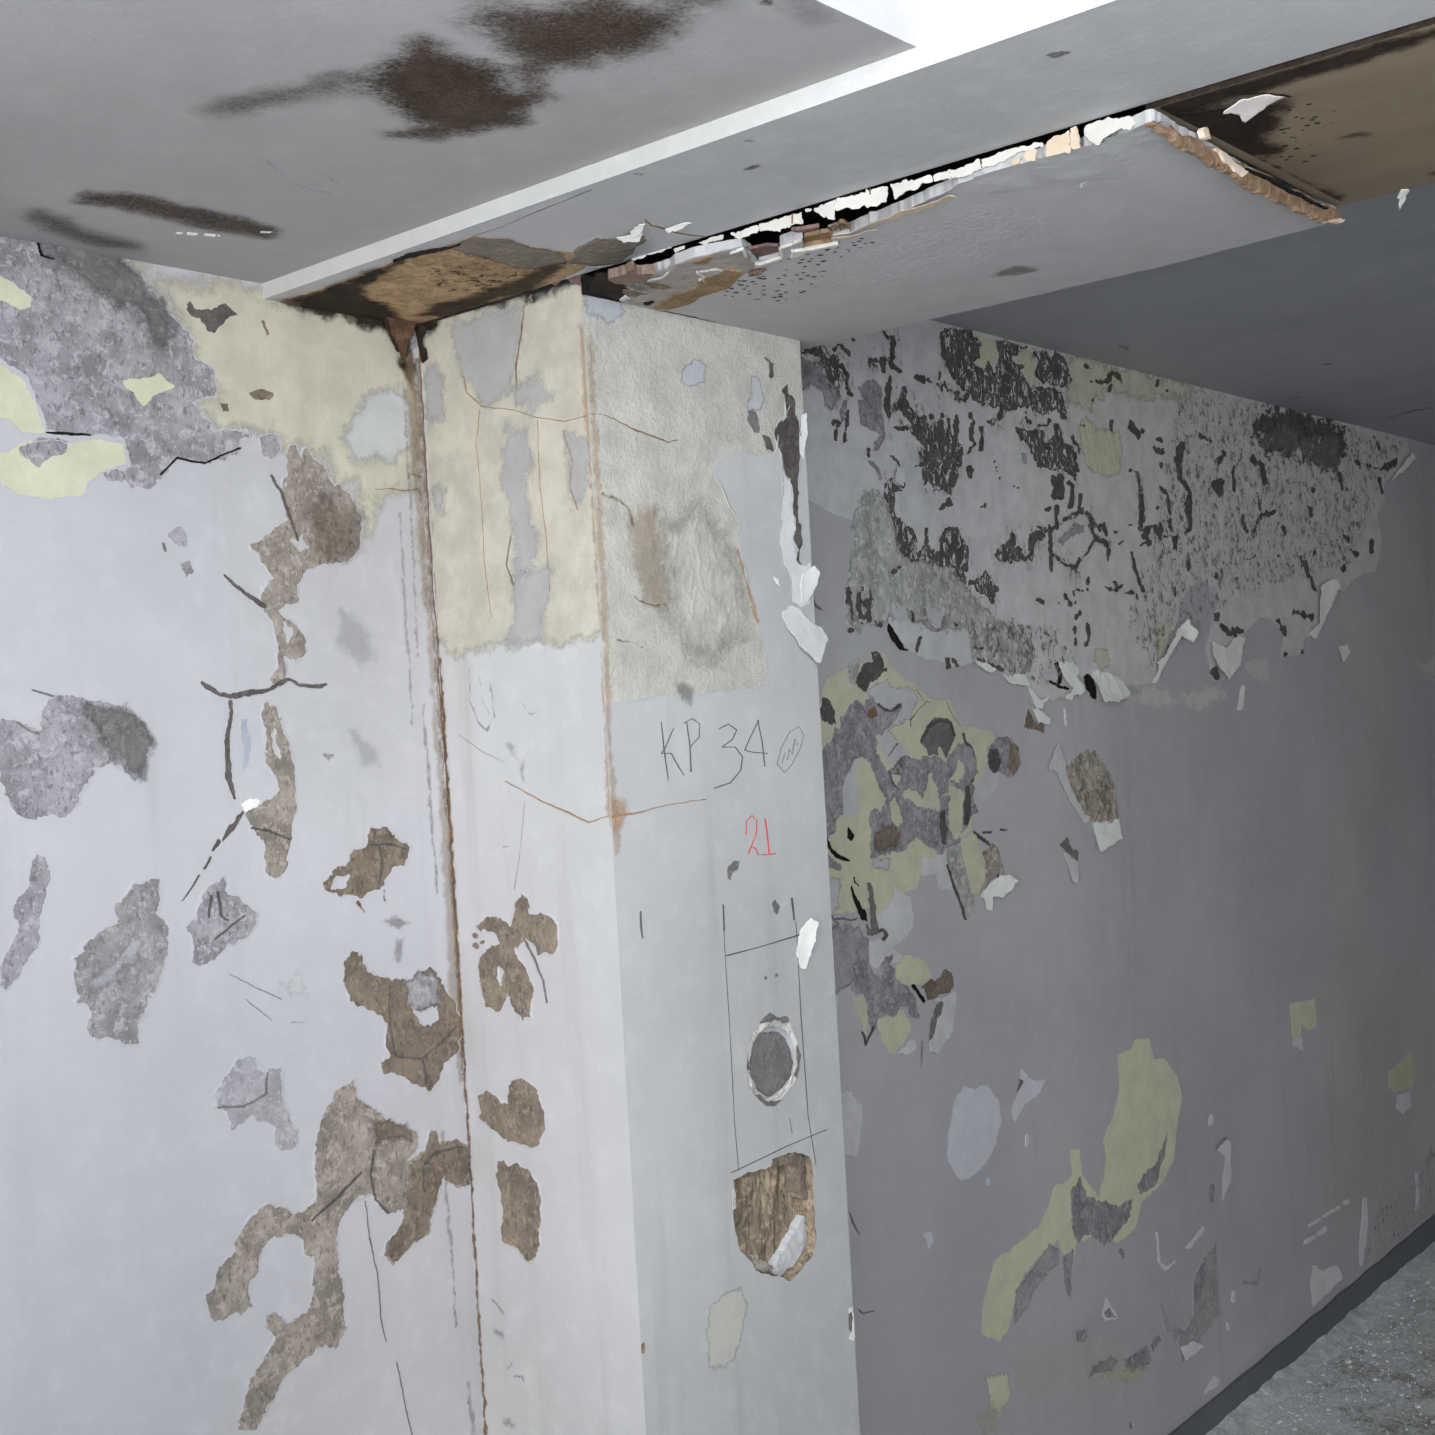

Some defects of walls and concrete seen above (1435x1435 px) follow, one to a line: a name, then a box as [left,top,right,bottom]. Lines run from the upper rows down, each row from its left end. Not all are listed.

water stain [358,0,714,139]
water stain [1160,30,1435,168]
water stain [78,192,278,238]
water stain [282,261,406,333]
water stain [417,265,562,317]
crack [644,219,705,237]
spalling [0,236,365,882]
peeling [747,320,1415,1067]
crack [182,811,244,901]
spalling [68,874,261,1049]
spalling [339,947,461,1095]
spalling [199,1050,470,1435]